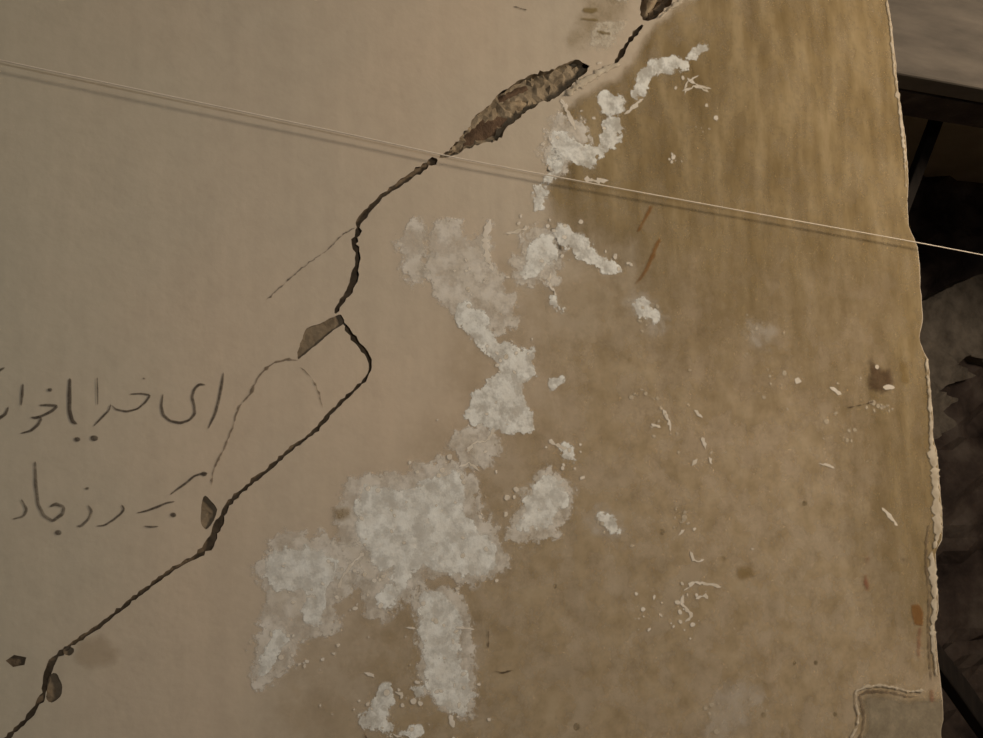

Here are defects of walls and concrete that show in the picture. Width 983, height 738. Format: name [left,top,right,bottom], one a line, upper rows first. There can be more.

spalling [439,59,588,158]
crack [615,25,643,63]
spalling [640,0,672,21]
spalling [886,2,907,169]
crack [5,157,438,738]
damp [246,0,942,738]
spalling [925,358,943,678]
peeling [850,684,943,738]